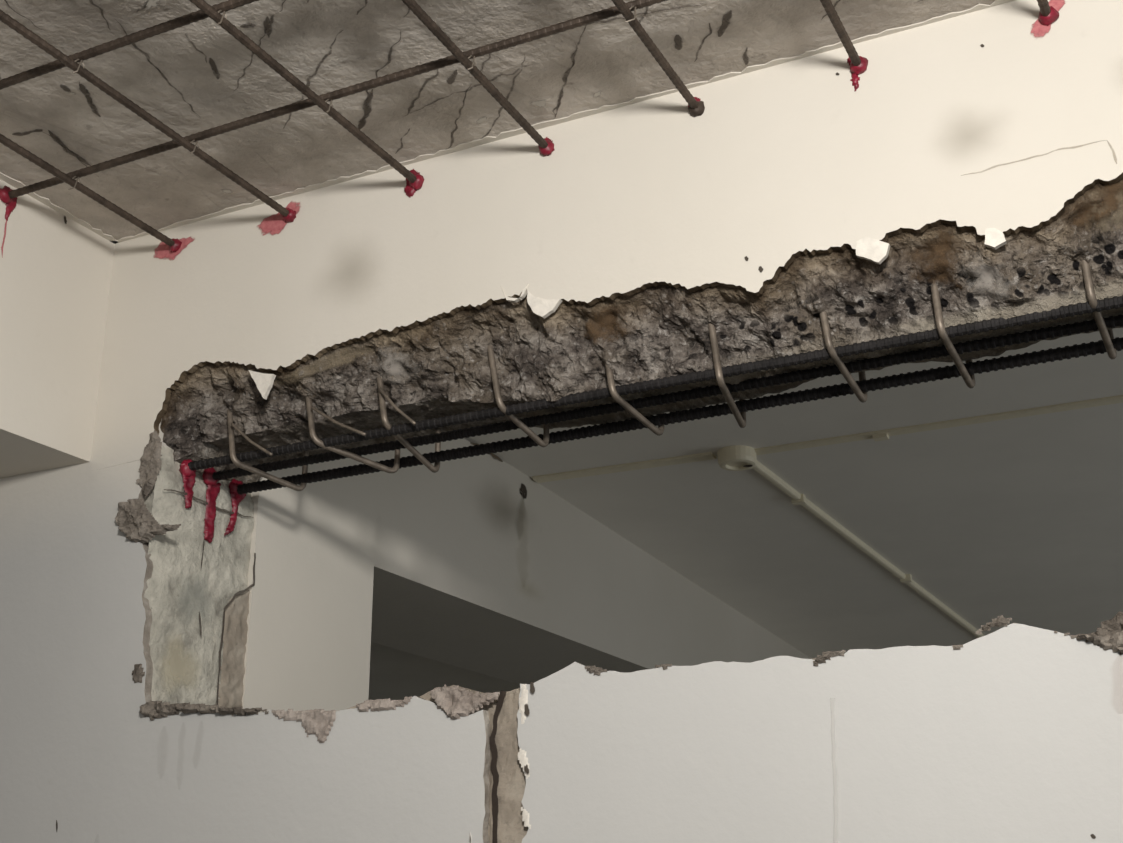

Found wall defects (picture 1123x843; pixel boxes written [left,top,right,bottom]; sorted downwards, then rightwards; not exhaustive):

crack [234,0,286,91]
crack [365,30,401,118]
crack [405,69,438,116]
spalling [115,178,1123,543]
spalling [976,615,1012,635]
spalling [1054,611,1123,655]
spalling [132,664,145,683]
spalling [813,650,846,666]
spalling [356,696,412,712]
spalling [430,682,535,843]
crack [469,690,506,843]